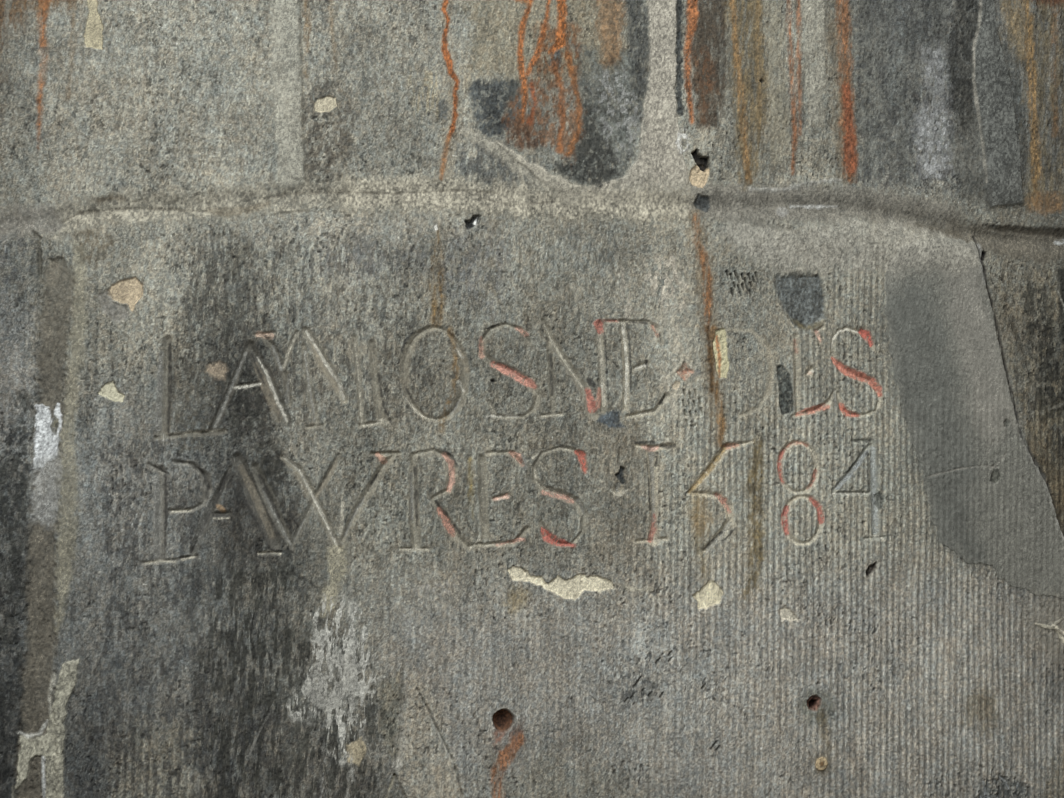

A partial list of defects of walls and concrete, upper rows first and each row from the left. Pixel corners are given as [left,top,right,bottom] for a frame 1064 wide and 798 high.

rust [0,0,72,46]
rust [441,0,459,179]
rust [507,0,581,155]
rust [838,0,856,181]
spalling [107,277,143,311]
spalling [508,567,613,600]
spalling [693,581,723,608]